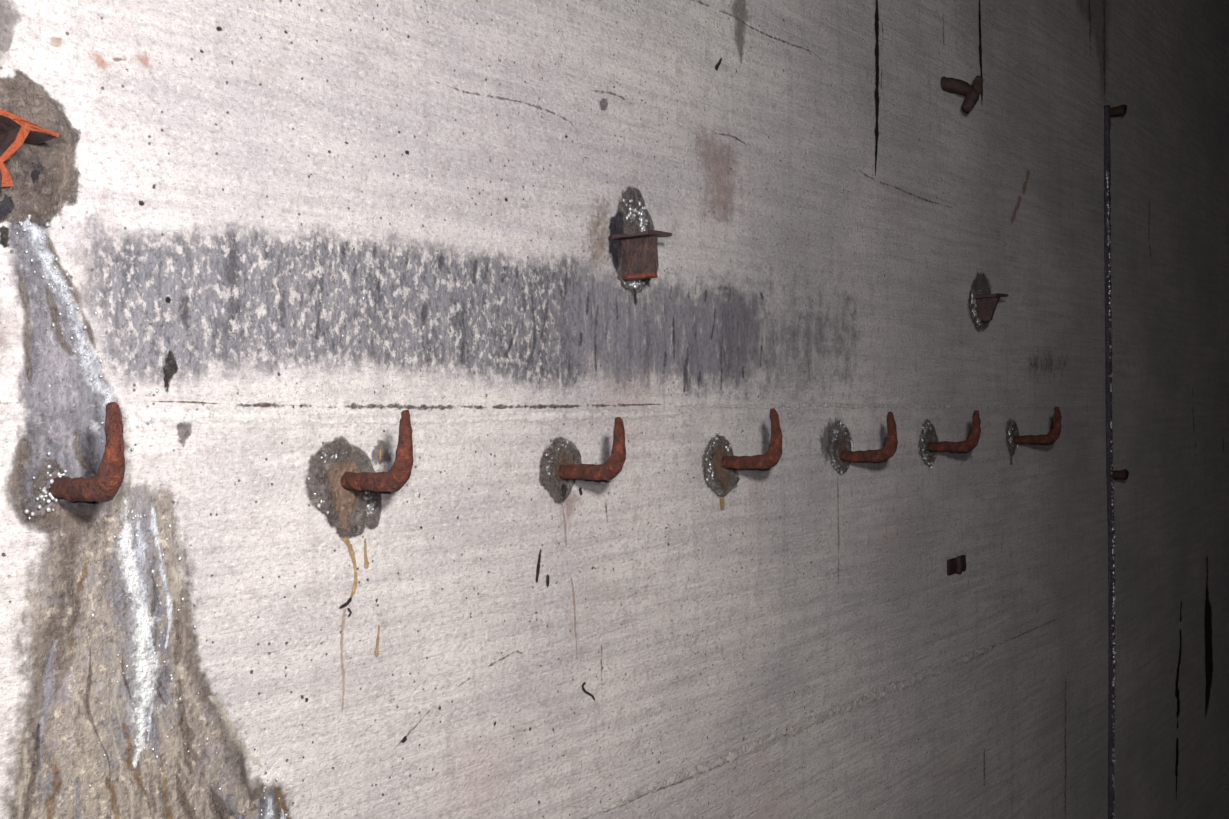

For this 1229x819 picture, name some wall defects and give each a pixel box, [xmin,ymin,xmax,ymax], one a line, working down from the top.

damp [0,0,19,56]
spalling [0,70,81,247]
spalling [609,186,655,304]
crack [860,0,949,207]
crack [976,0,984,104]
damp [5,212,823,819]
corrosion [339,536,369,710]